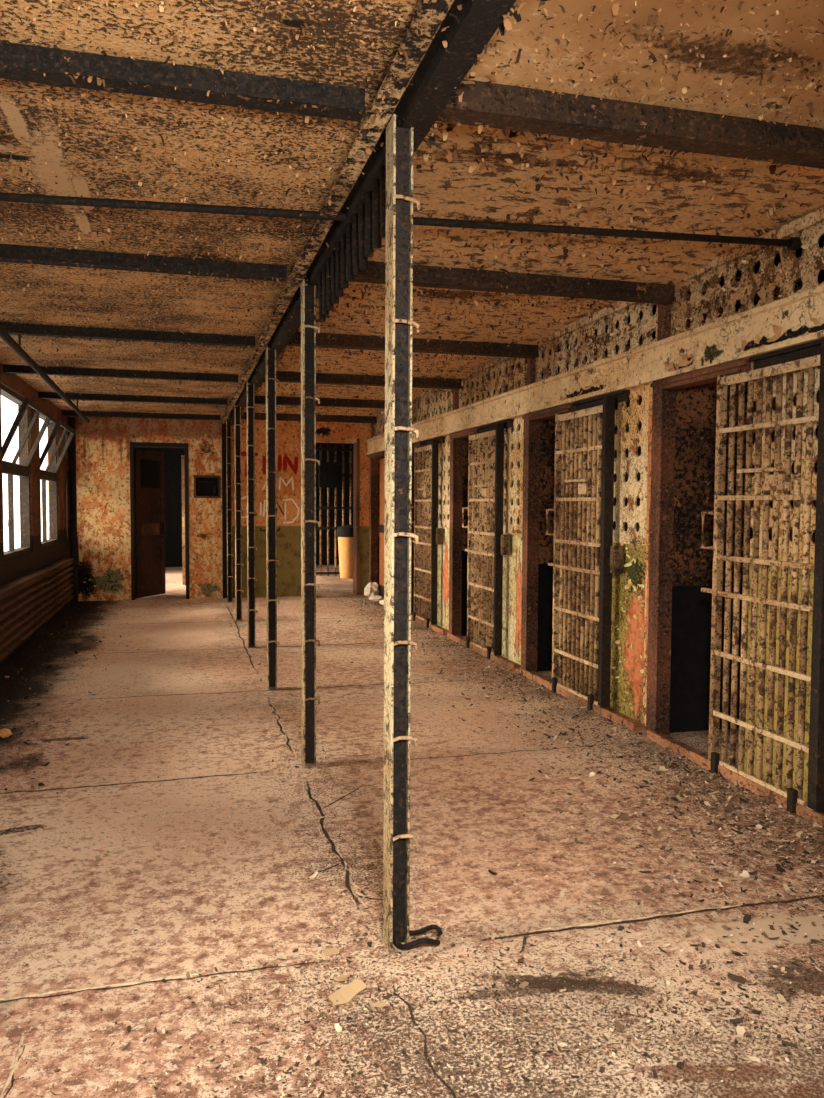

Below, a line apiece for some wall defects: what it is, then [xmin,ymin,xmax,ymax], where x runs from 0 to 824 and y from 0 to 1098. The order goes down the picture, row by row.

peeling [83,566,130,597]
peeling [197,579,222,598]
peeling [610,533,650,705]
crack [0,771,273,794]
crack [75,607,384,909]
crack [480,895,824,953]
crack [0,960,334,1003]
crack [392,982,457,1098]